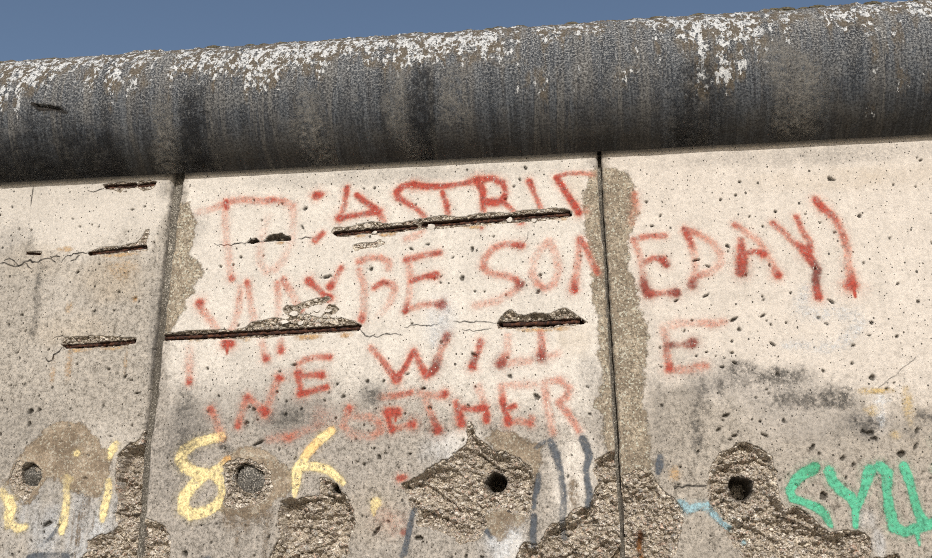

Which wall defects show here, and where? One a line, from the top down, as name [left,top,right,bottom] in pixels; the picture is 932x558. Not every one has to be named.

water stain [153,89,211,174]
water stain [386,66,467,161]
water stain [761,41,826,136]
crack [2,252,86,268]
rust [331,208,572,237]
rust [61,335,137,352]
rust [163,318,362,342]
rust [497,308,588,331]
peeling [516,167,685,558]
spalling [219,446,356,558]
spalling [401,421,543,545]
spalling [707,442,900,558]